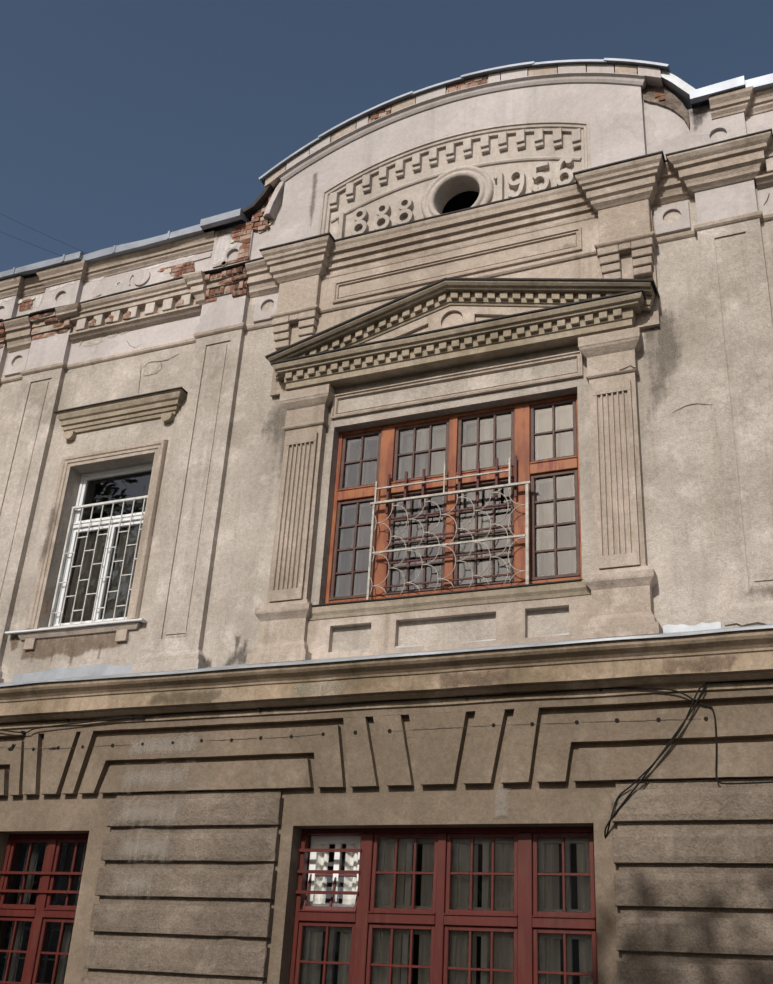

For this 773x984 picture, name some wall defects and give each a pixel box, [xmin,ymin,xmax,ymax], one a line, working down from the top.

flaking render [141,191,274,308]
flaking render [0,281,81,341]
peeling [79,311,131,346]